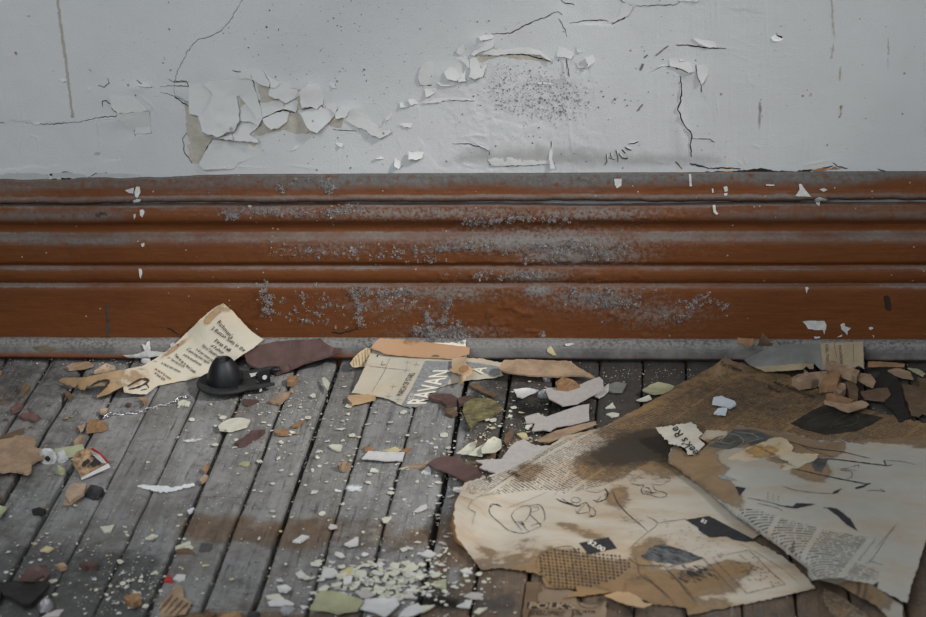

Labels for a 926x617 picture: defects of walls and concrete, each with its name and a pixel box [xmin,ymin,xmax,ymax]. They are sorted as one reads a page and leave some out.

crack [491,0,607,36]
crack [160,0,242,102]
peeling [655,58,709,84]
peeling [676,38,726,49]
crack [29,78,117,125]
peeling [173,34,595,170]
crack [675,67,714,169]